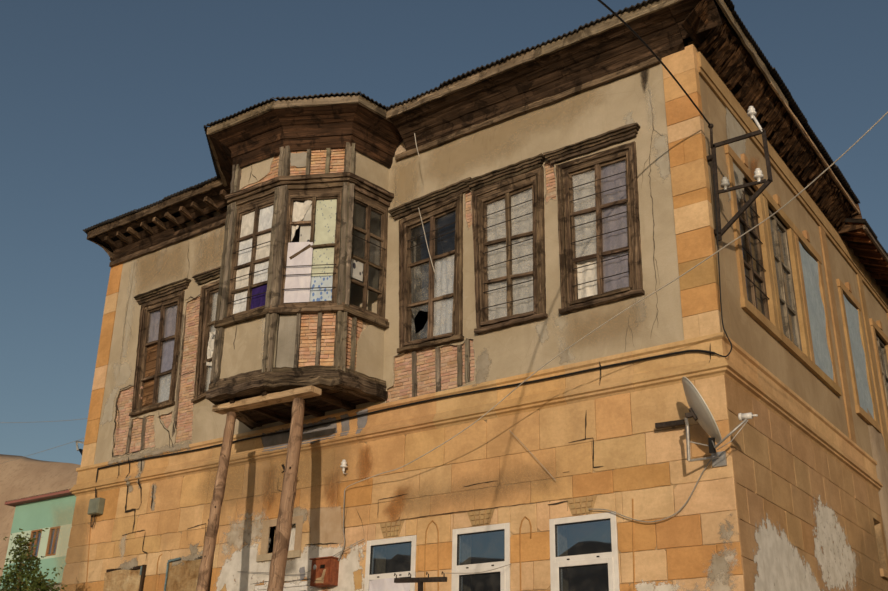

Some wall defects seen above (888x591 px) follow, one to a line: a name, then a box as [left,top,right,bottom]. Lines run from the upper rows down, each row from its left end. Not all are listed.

crack [624,85,670,353]
crack [112,270,157,558]
flaking render [113,295,200,457]
flaking render [385,338,476,403]
crack [569,414,603,468]
peeling [214,512,271,591]
peeling [284,506,366,591]
peeling [635,549,736,591]
peeling [752,495,859,591]